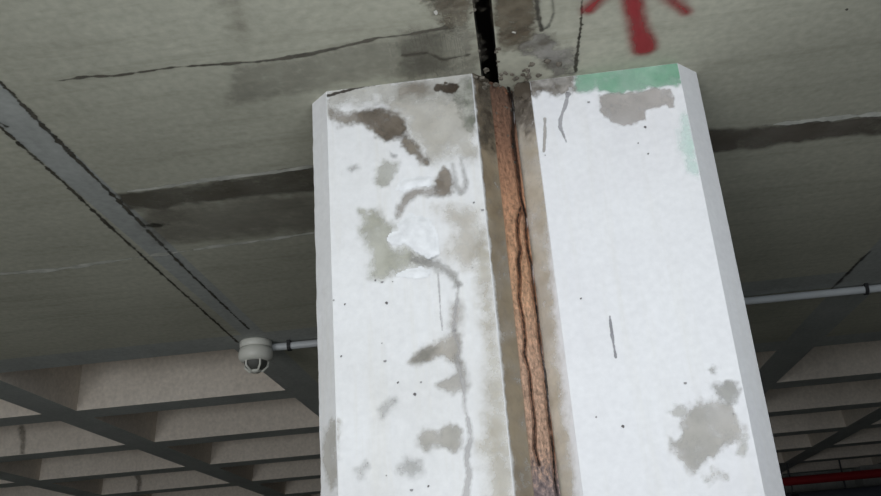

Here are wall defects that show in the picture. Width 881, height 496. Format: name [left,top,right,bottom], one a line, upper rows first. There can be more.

crack [60,26,469,81]
water stain [423,0,473,30]
water stain [535,0,550,32]
crack [574,2,584,72]
crack [543,92,571,152]
water stain [328,74,534,496]
crack [507,86,558,494]
water stain [513,96,572,496]
water stain [324,421,337,485]
water stain [672,381,746,469]